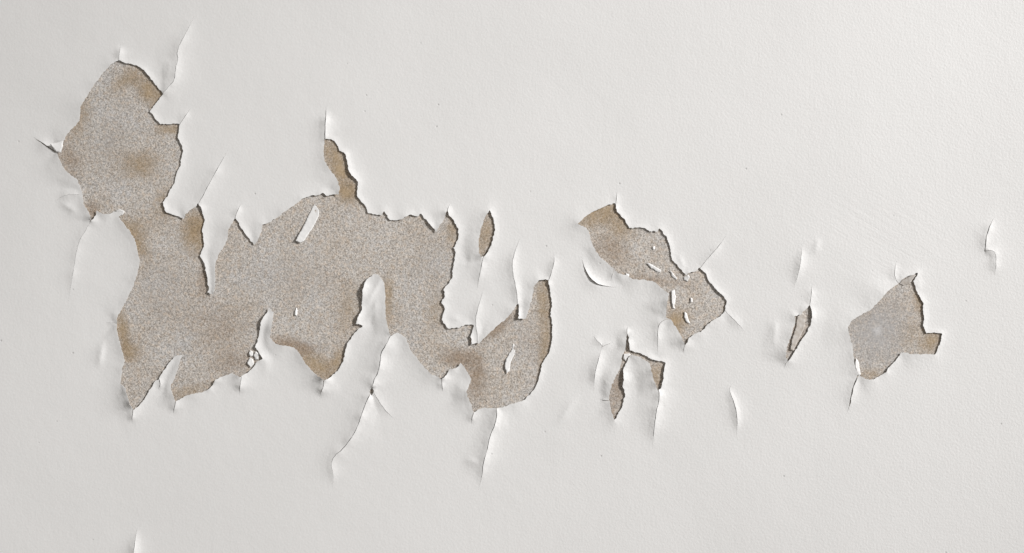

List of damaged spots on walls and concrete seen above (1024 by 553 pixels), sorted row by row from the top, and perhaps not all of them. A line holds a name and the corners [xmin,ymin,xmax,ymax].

peeling [27,9,562,496]
peeling [568,185,751,455]
peeling [777,278,820,375]
peeling [837,254,951,421]